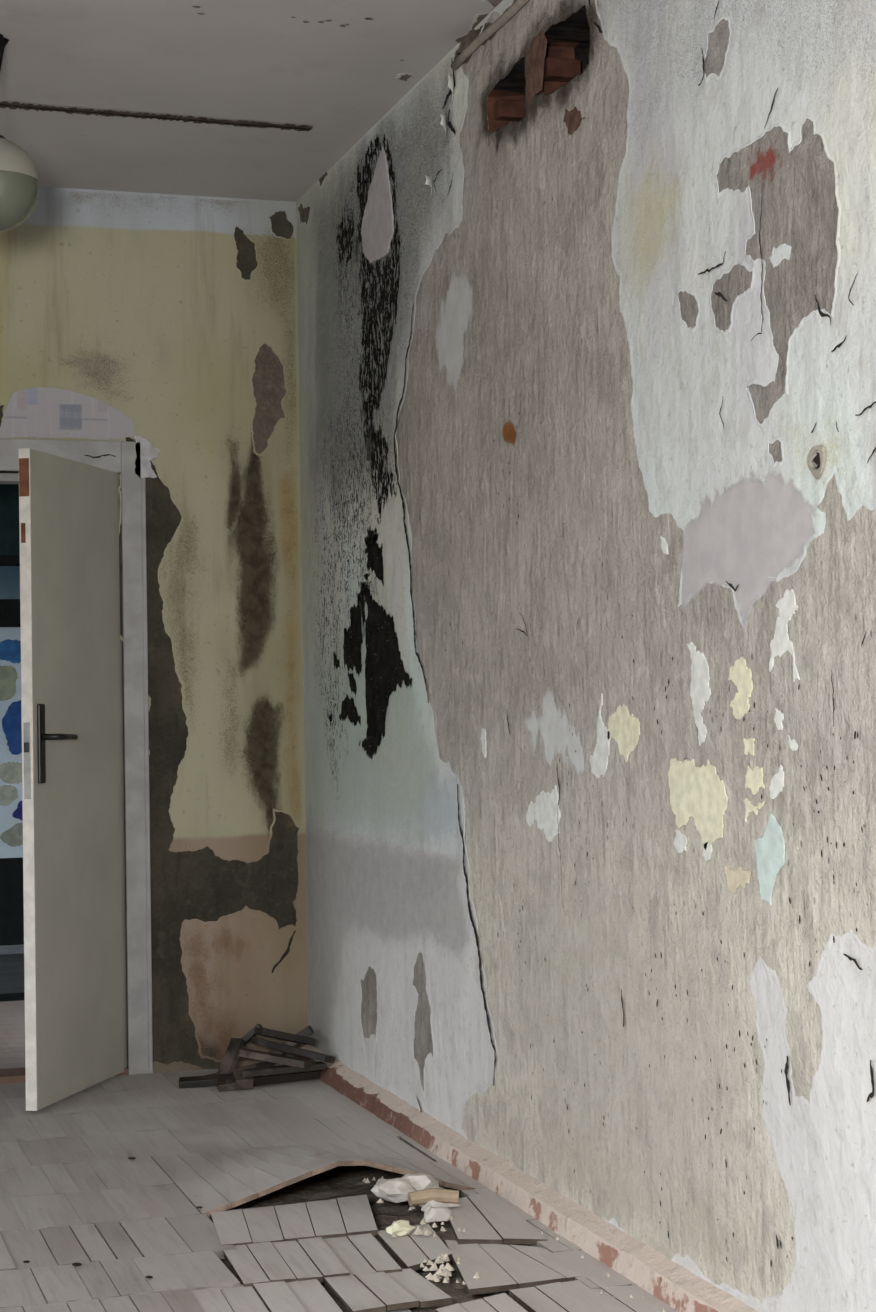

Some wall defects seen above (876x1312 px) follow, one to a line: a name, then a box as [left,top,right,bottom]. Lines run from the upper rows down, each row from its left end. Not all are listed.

crack [0,102,313,131]
peeling [118,436,301,1070]
water stain [47,52,477,1057]
peeling [394,0,876,1311]